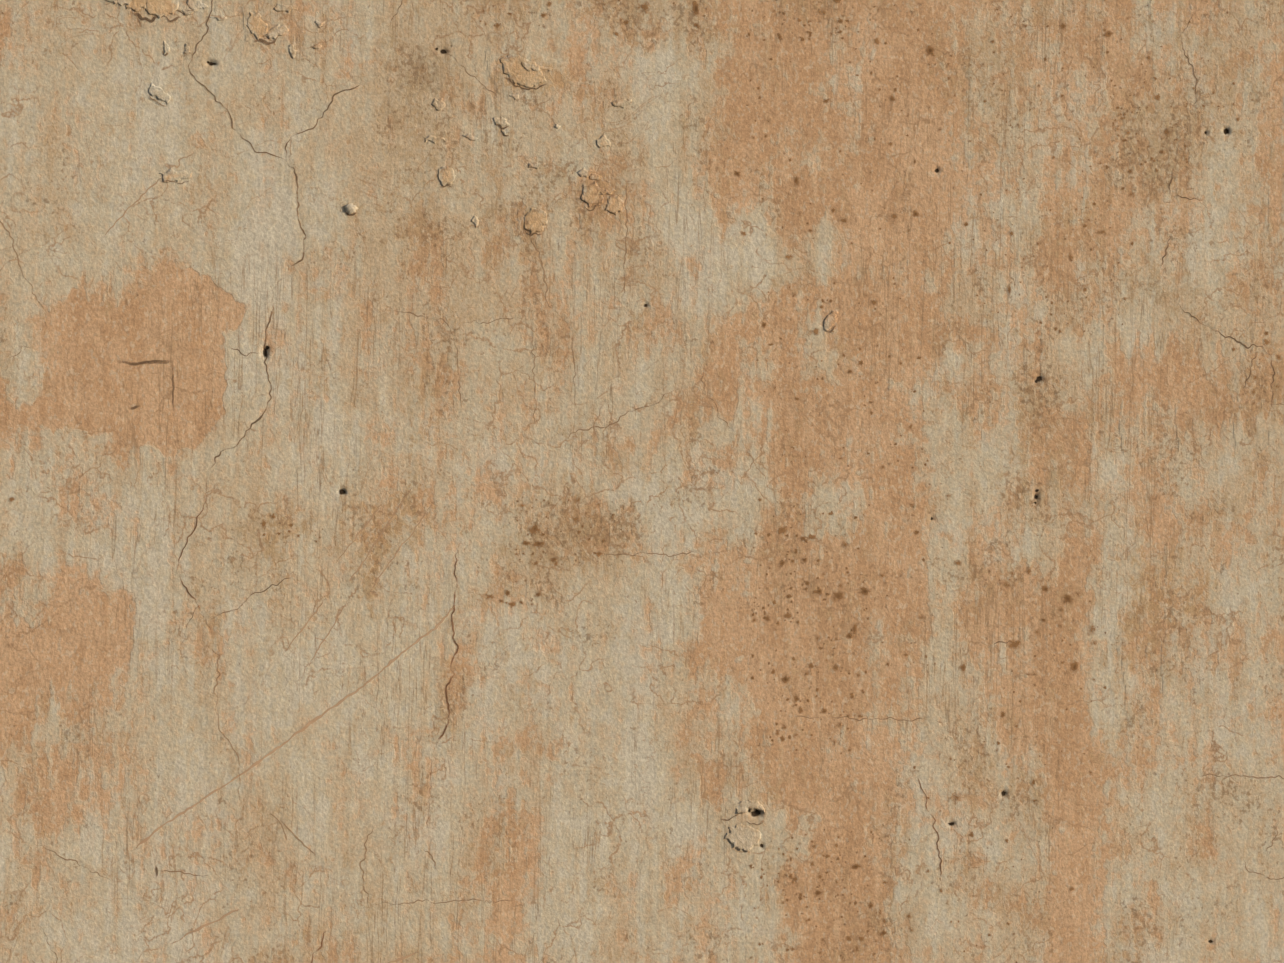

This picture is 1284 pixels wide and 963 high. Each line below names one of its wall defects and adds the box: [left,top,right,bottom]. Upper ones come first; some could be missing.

flaking render [104,0,227,56]
flaking render [242,4,325,58]
crack [188,0,358,270]
crack [0,221,43,307]
crack [178,308,289,797]
crack [439,555,459,739]